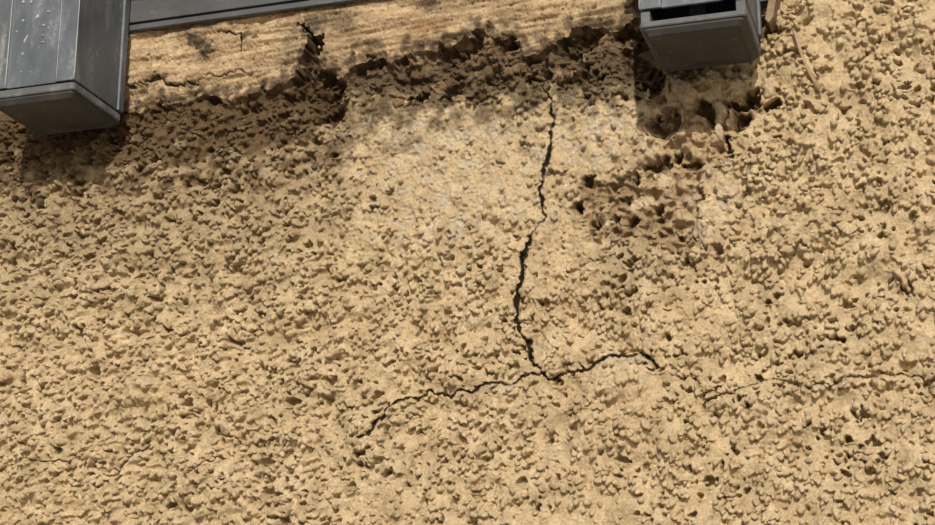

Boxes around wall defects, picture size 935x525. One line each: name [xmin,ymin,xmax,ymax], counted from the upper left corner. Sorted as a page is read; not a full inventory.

damp [0,9,352,205]
crack [127,31,245,88]
damp [319,19,655,166]
damp [567,5,641,31]
crack [357,59,935,438]